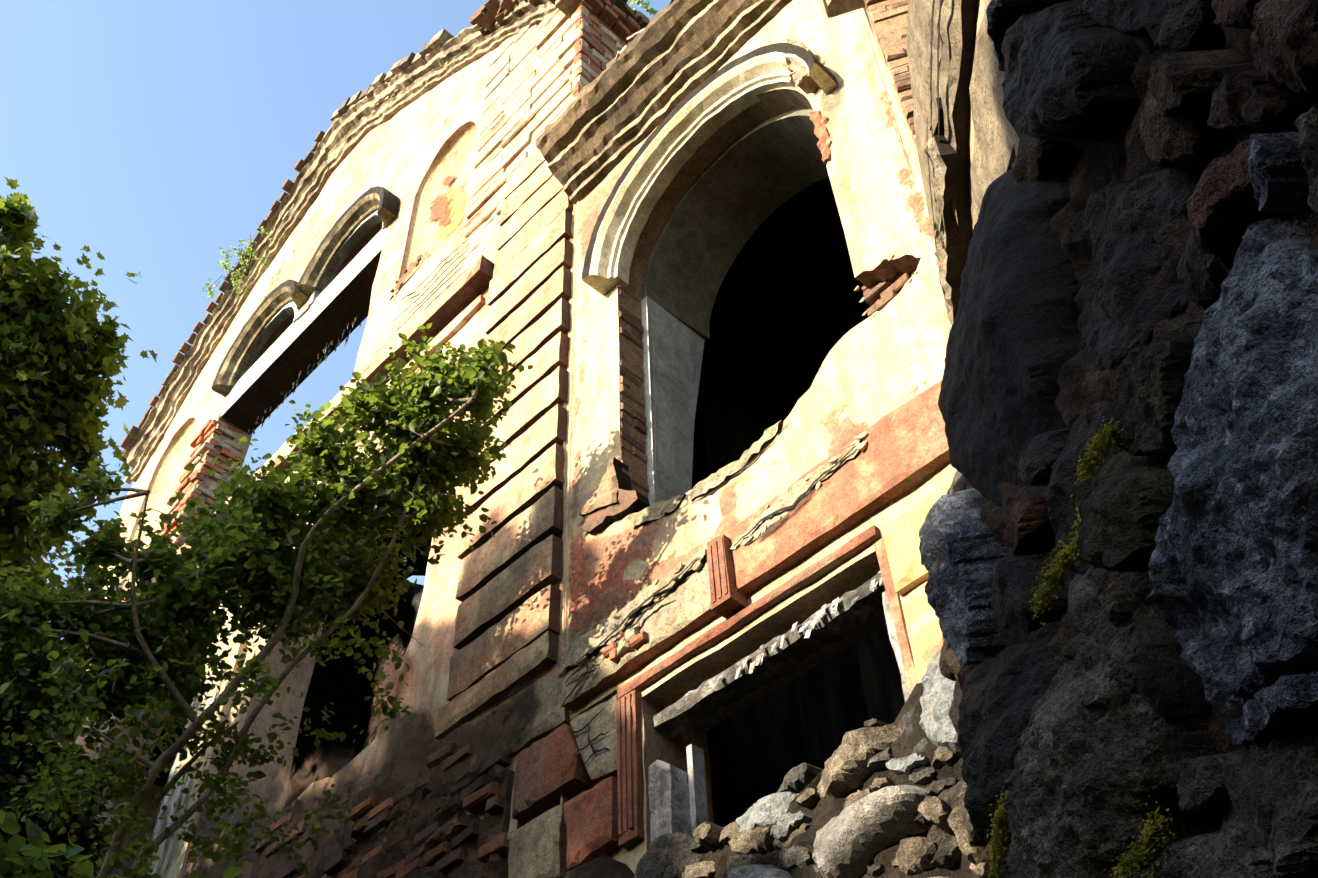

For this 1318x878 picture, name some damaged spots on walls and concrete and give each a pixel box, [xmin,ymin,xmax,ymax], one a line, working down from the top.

flaking render [464,0,675,240]
flaking render [783,38,820,94]
flaking render [809,111,832,164]
peeling [877,90,897,130]
flaking render [425,175,455,226]
flaking render [896,97,962,326]
spalling [854,253,918,317]
flaking render [158,415,243,552]
peeling [557,405,869,683]
crack [560,663,609,767]